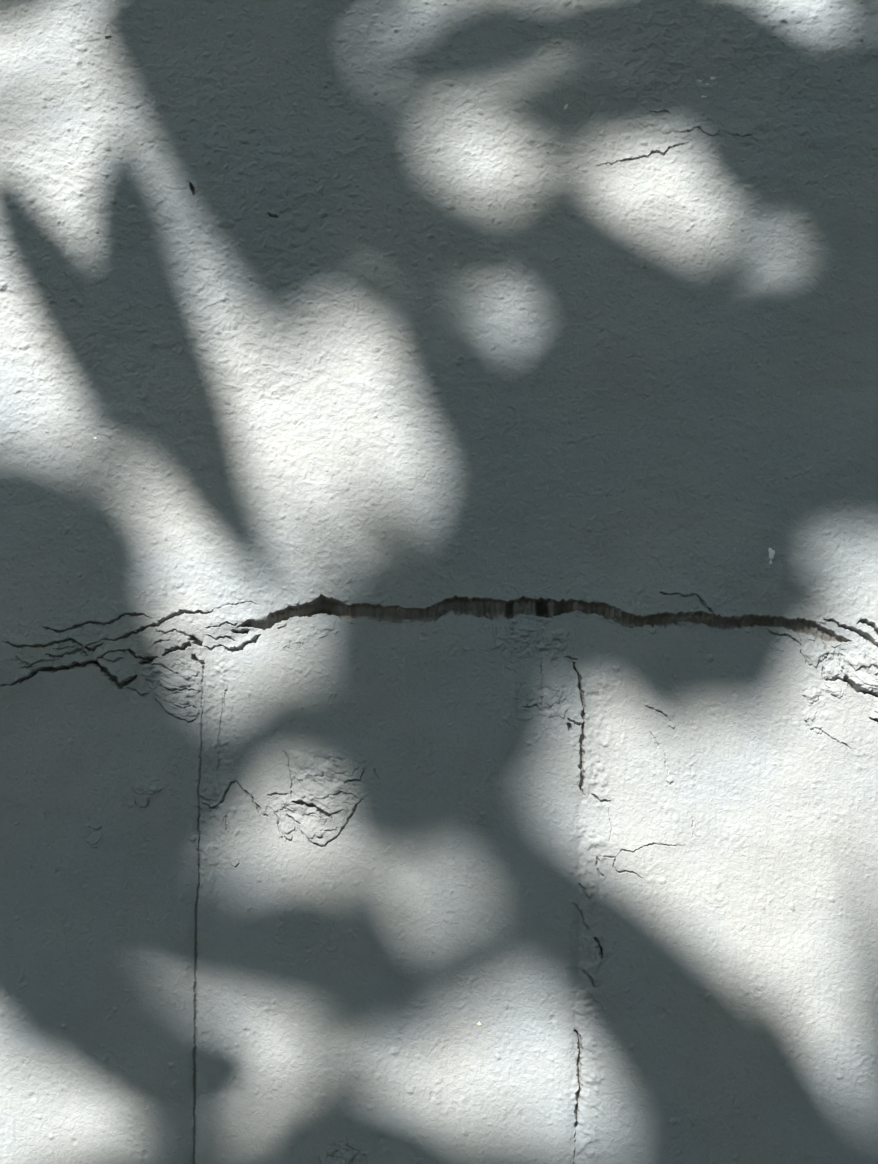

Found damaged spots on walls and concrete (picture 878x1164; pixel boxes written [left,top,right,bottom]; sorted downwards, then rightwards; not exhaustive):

crack [593,109,756,167]
spalling [135,654,204,724]
spalling [799,635,878,751]
spalling [235,747,380,849]
crack [0,590,878,1164]